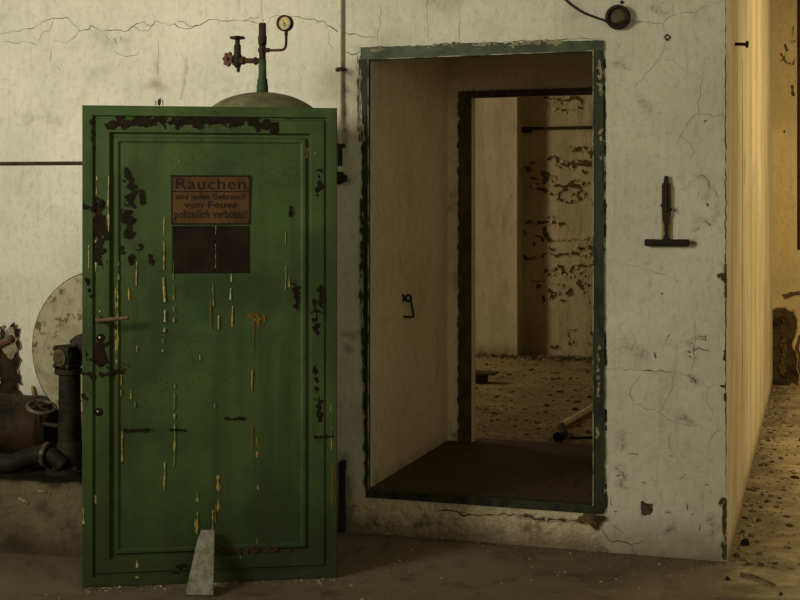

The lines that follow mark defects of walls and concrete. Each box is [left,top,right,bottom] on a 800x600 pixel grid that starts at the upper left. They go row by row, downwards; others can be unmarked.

crack [2,1,382,70]
peeling [523,59,607,251]
crack [625,0,743,411]
peeling [522,215,593,306]
flaking render [0,322,23,395]
flaking render [596,331,608,397]
crack [606,323,721,450]
flaking render [773,291,800,386]
crack [437,509,516,517]
flaking render [641,501,653,516]